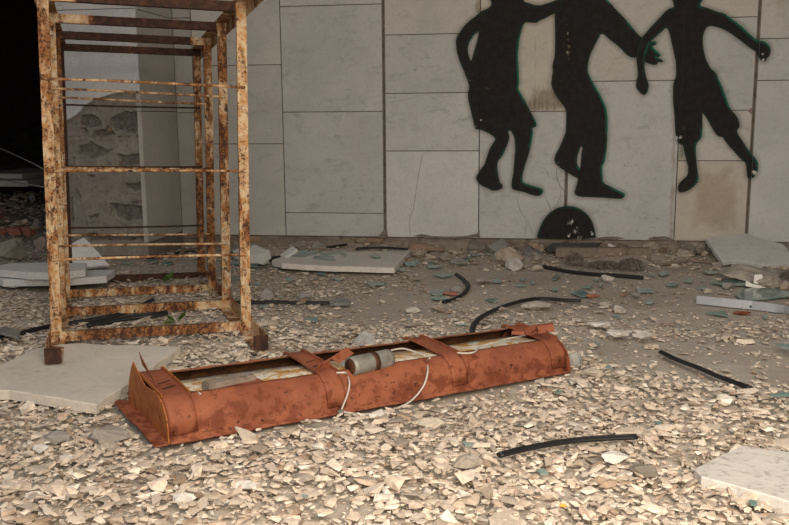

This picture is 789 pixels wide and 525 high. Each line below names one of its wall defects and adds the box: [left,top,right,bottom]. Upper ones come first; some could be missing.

spalling [42,74,279,261]
spalling [351,229,480,252]
spalling [488,238,563,249]
spalling [581,236,712,254]